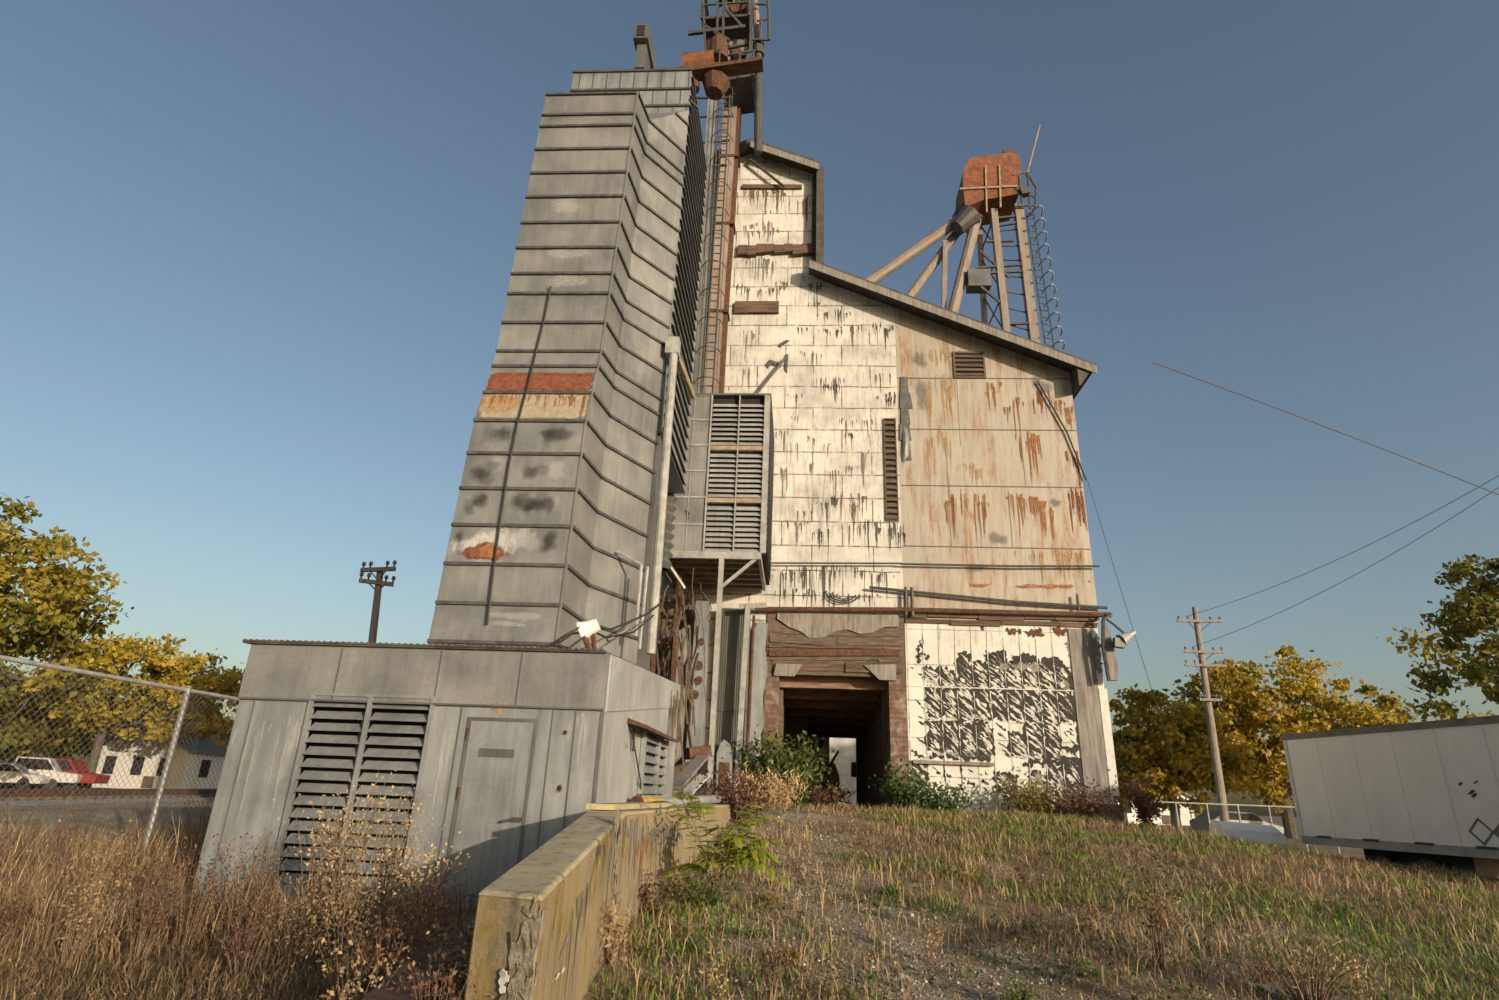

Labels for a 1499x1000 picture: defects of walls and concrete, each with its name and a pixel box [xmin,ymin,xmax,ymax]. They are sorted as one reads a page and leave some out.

water stain [736,190,808,300]
rust [454,529,525,561]
rust [478,372,594,419]
water stain [742,330,755,386]
water stain [772,282,906,613]
rust [916,349,1001,558]
rust [985,382,1091,589]
peeling [909,626,1097,800]
spalling [498,897,573,1000]
water stain [562,817,678,1000]